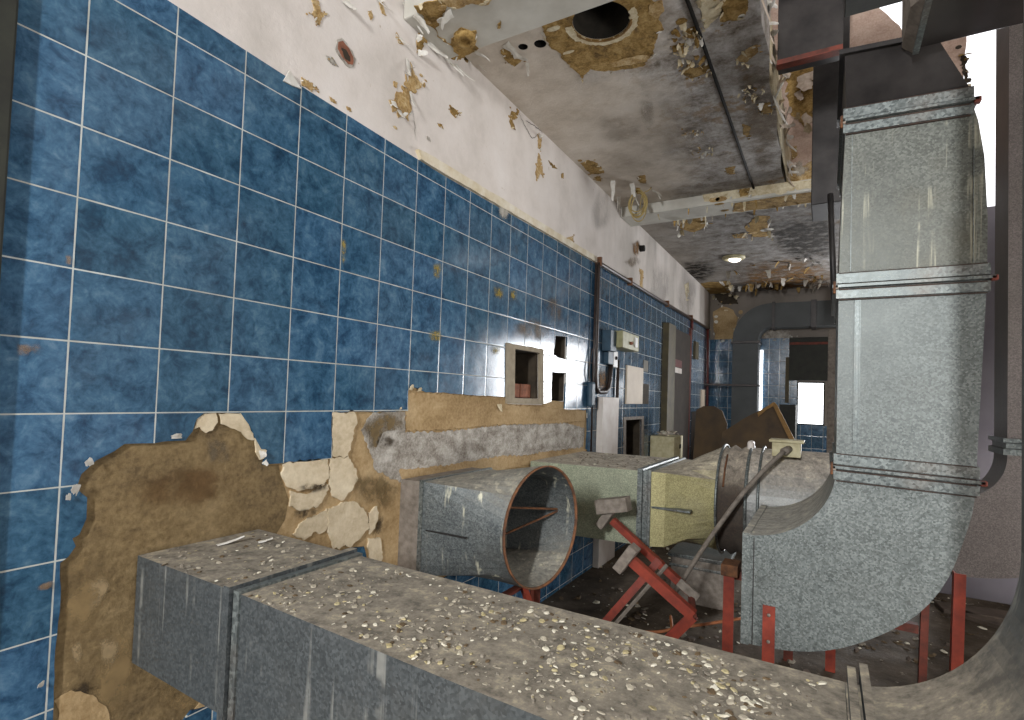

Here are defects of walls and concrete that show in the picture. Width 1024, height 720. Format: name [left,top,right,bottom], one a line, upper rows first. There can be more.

peeling [306,0,328,26]
peeling [341,0,390,20]
spalling [326,38,356,68]
peeling [389,0,492,130]
peeling [500,41,529,76]
peeling [283,70,352,112]
peeling [508,107,519,130]
spalling [541,0,813,241]
peeling [535,133,564,181]
spalling [684,258,829,342]
peeling [37,384,587,720]